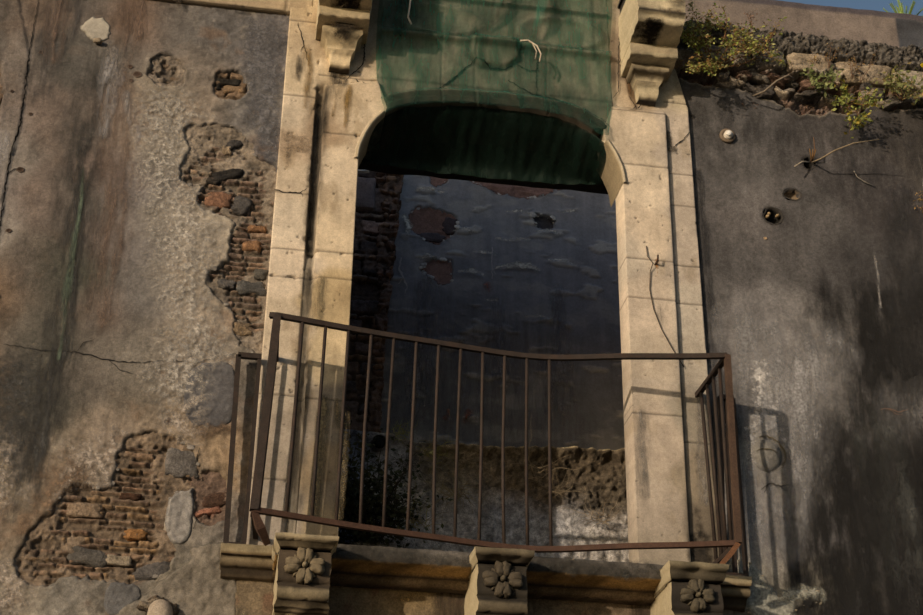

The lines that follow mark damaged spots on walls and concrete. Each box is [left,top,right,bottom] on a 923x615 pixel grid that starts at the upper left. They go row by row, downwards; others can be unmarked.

leakage [333,0,361,10]
crack [0,2,39,226]
leakage [59,427,120,493]
spalling [14,432,227,587]
crack [6,339,236,373]
spalling [180,123,277,354]
spalling [214,72,249,100]
leakage [243,18,327,253]
spalling [368,172,484,433]
flaking render [470,181,558,199]
leakage [695,172,710,271]
leakage [736,197,923,615]